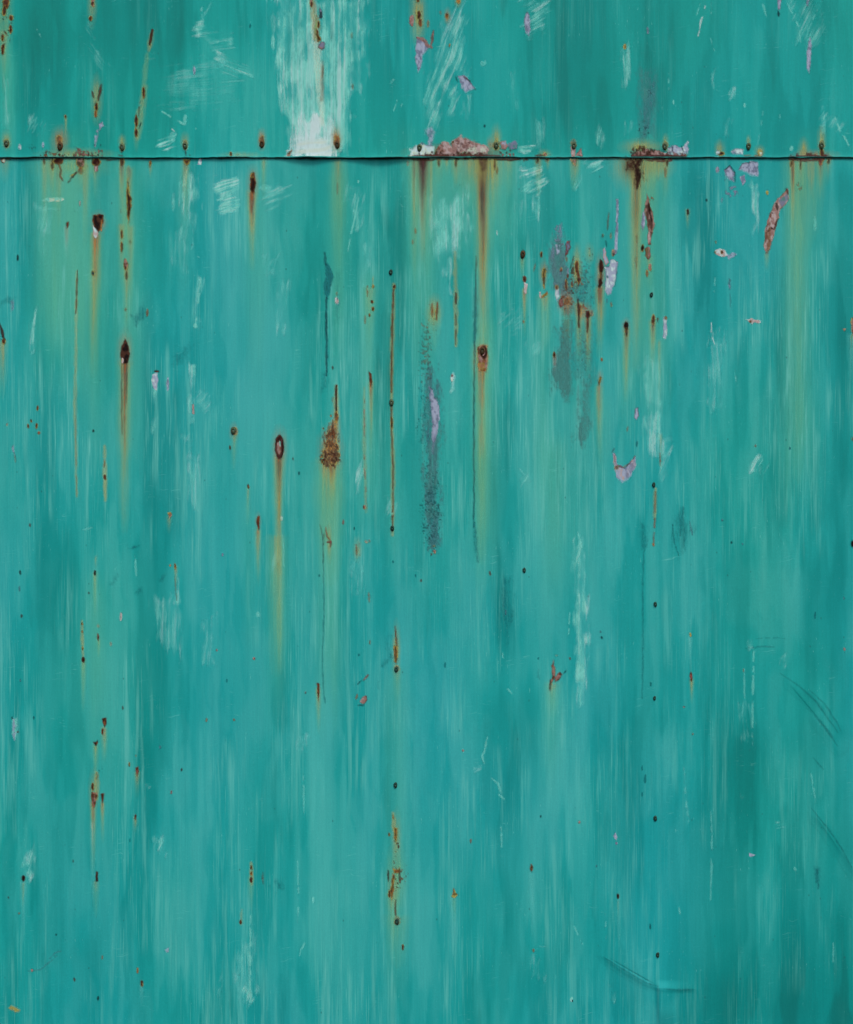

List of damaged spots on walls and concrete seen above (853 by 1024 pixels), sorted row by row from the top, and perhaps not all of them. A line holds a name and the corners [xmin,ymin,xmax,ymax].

peeling [410,130,501,156]
corrosion [92,214,103,275]
corrosion [412,138,548,278]
peeling [555,240,573,307]
peeling [602,199,619,306]
peeling [641,196,655,277]
corrosion [625,158,672,235]
peeling [764,188,789,252]
corrosion [120,340,130,440]
corrosion [275,435,284,515]
corrosion [320,385,340,487]
peeling [613,441,638,482]